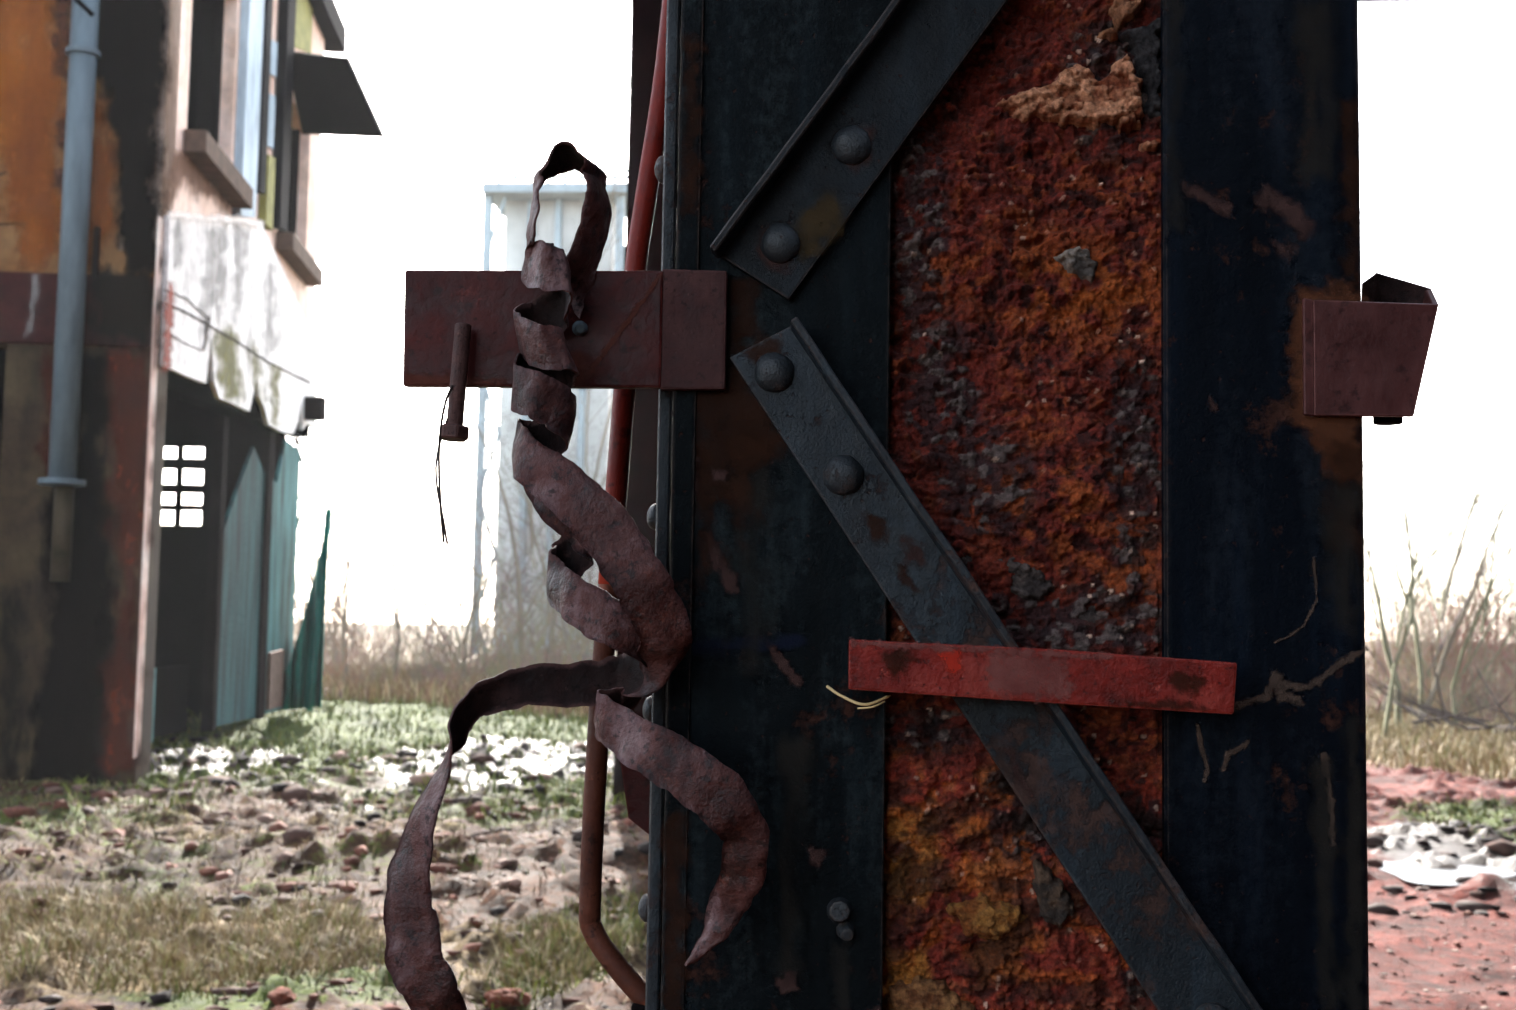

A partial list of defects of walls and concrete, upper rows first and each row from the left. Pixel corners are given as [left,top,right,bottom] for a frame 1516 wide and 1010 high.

corrosion [0,0,66,272]
corrosion [87,95,116,272]
spalling [995,0,1161,153]
corrosion [36,351,53,476]
damp [0,0,230,785]
damp [214,327,281,425]
corrosion [404,373,505,387]
corrosion [572,273,662,389]
corrosion [1288,102,1371,551]
corrosion [100,282,175,777]